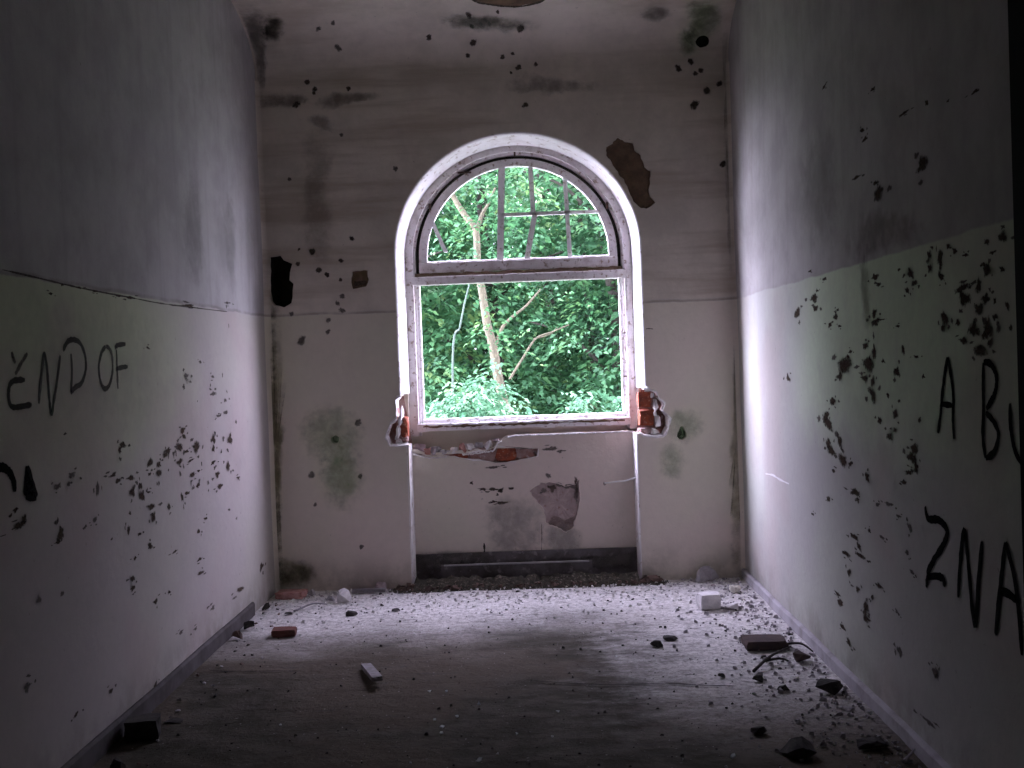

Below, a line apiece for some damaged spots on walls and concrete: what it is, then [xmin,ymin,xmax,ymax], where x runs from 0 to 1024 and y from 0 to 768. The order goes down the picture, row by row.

damp [452,10,524,58]
flaking render [605,136,655,210]
spalling [267,254,296,309]
flaking render [350,269,370,289]
peeling [794,270,841,329]
peeling [898,225,1014,361]
peeling [832,310,922,403]
flaking render [385,386,687,463]
flaking render [528,477,581,533]